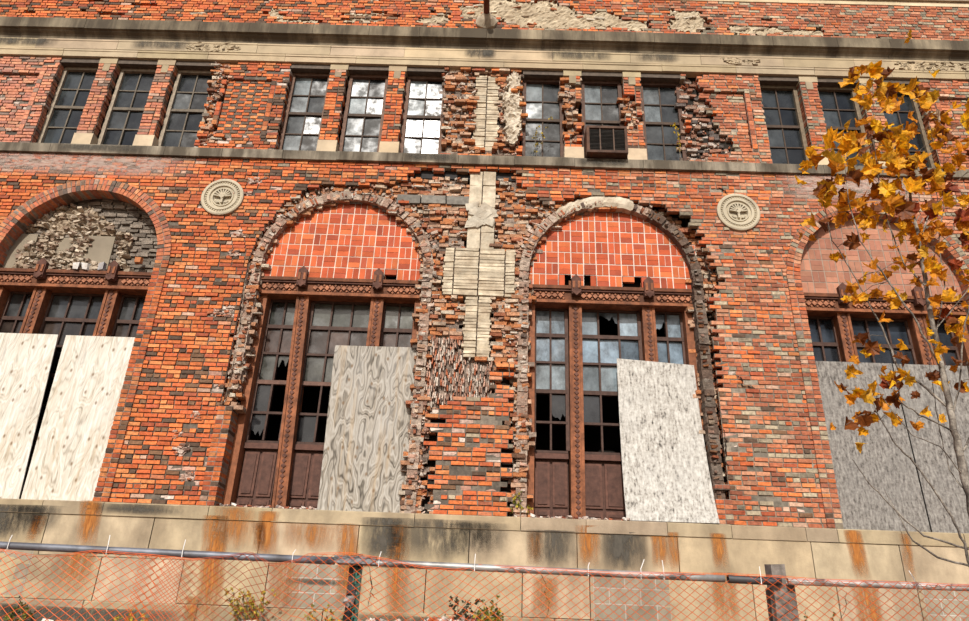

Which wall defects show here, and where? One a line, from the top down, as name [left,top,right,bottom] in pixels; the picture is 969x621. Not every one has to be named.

peeling [416,0,647,31]
peeling [667,10,706,33]
spalling [186,42,241,146]
spalling [439,67,526,155]
spalling [674,79,731,161]
spalling [207,172,728,528]
rust [82,501,100,540]
rust [186,507,276,621]
damp [367,517,495,555]
rust [580,525,597,560]
rust [652,533,679,564]
rust [846,530,866,571]